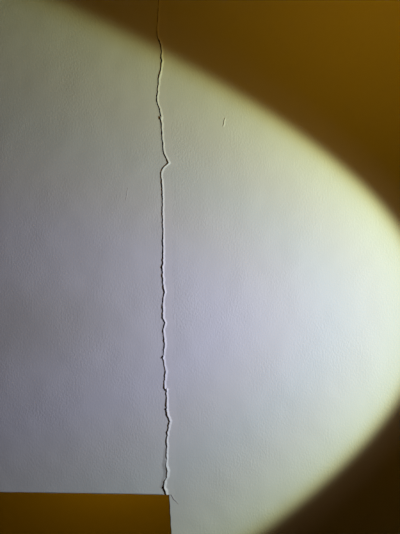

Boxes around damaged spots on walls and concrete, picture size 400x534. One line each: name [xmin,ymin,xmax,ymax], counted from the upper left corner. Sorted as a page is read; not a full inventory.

crack [154,0,179,504]